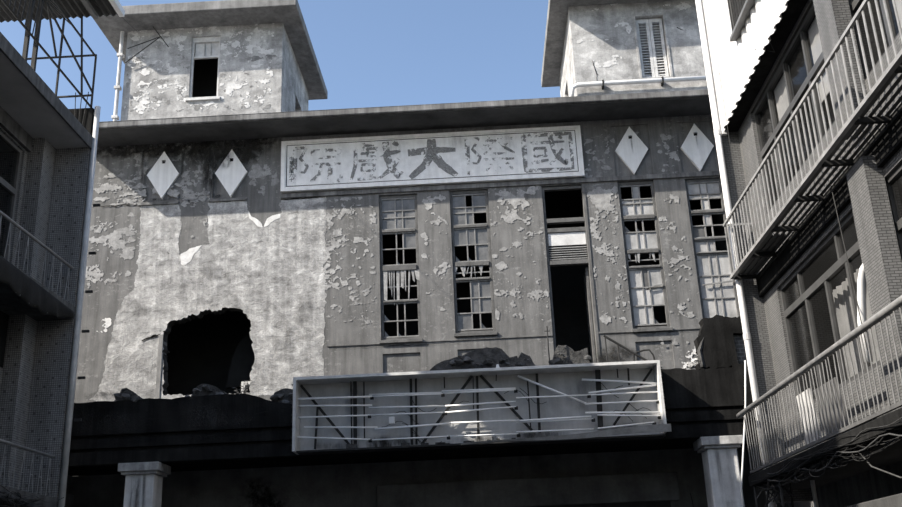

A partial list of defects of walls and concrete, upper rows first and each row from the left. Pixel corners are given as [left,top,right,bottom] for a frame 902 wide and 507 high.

peeling [124,24,274,114]
leakage [97,138,275,184]
peeling [656,134,680,173]
flaking render [85,142,376,401]
peeling [488,185,549,320]
peeling [587,186,630,325]
peeling [658,194,695,318]